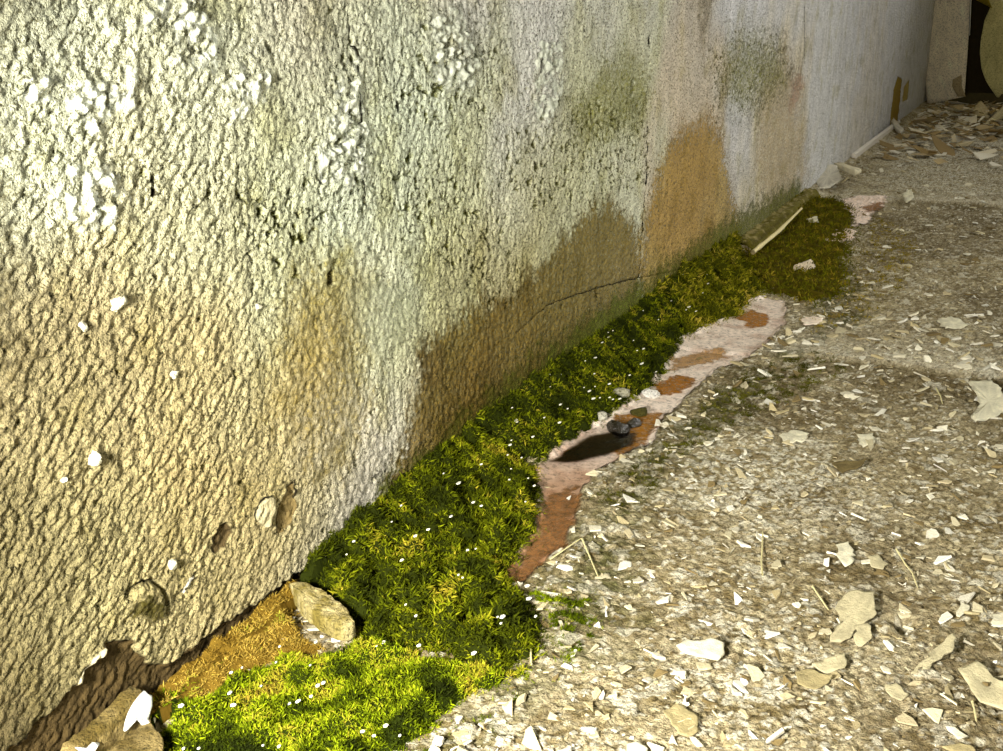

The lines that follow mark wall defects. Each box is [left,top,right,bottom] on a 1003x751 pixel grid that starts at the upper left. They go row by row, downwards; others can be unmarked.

leakage [275,250,411,470]
leakage [388,105,744,486]
crack [515,126,668,333]
flaking render [212,523,232,553]
flaking render [254,479,298,534]
leakage [341,437,382,528]
flaking render [7,570,303,751]